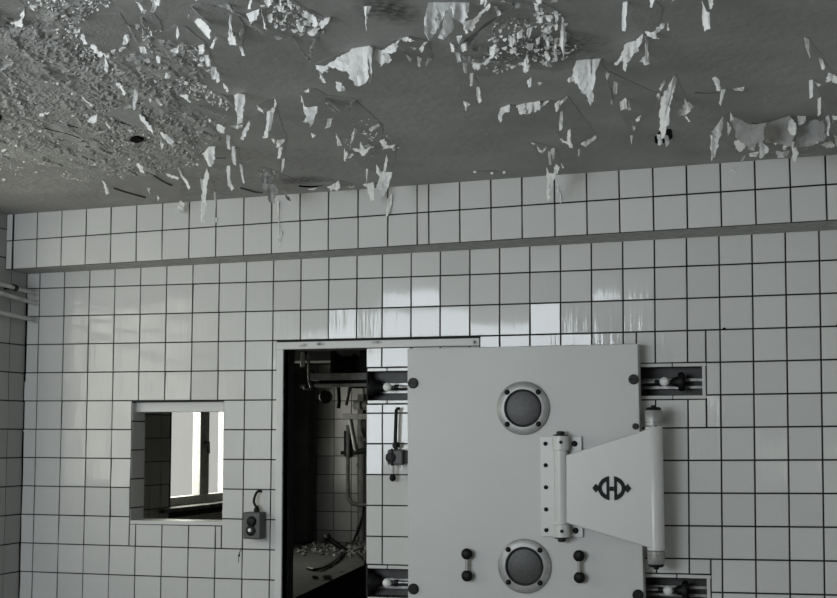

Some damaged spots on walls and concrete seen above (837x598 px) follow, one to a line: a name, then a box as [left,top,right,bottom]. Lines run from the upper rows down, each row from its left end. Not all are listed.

peeling [701,0,714,32]
peeling [0,0,693,247]
peeling [704,37,837,174]